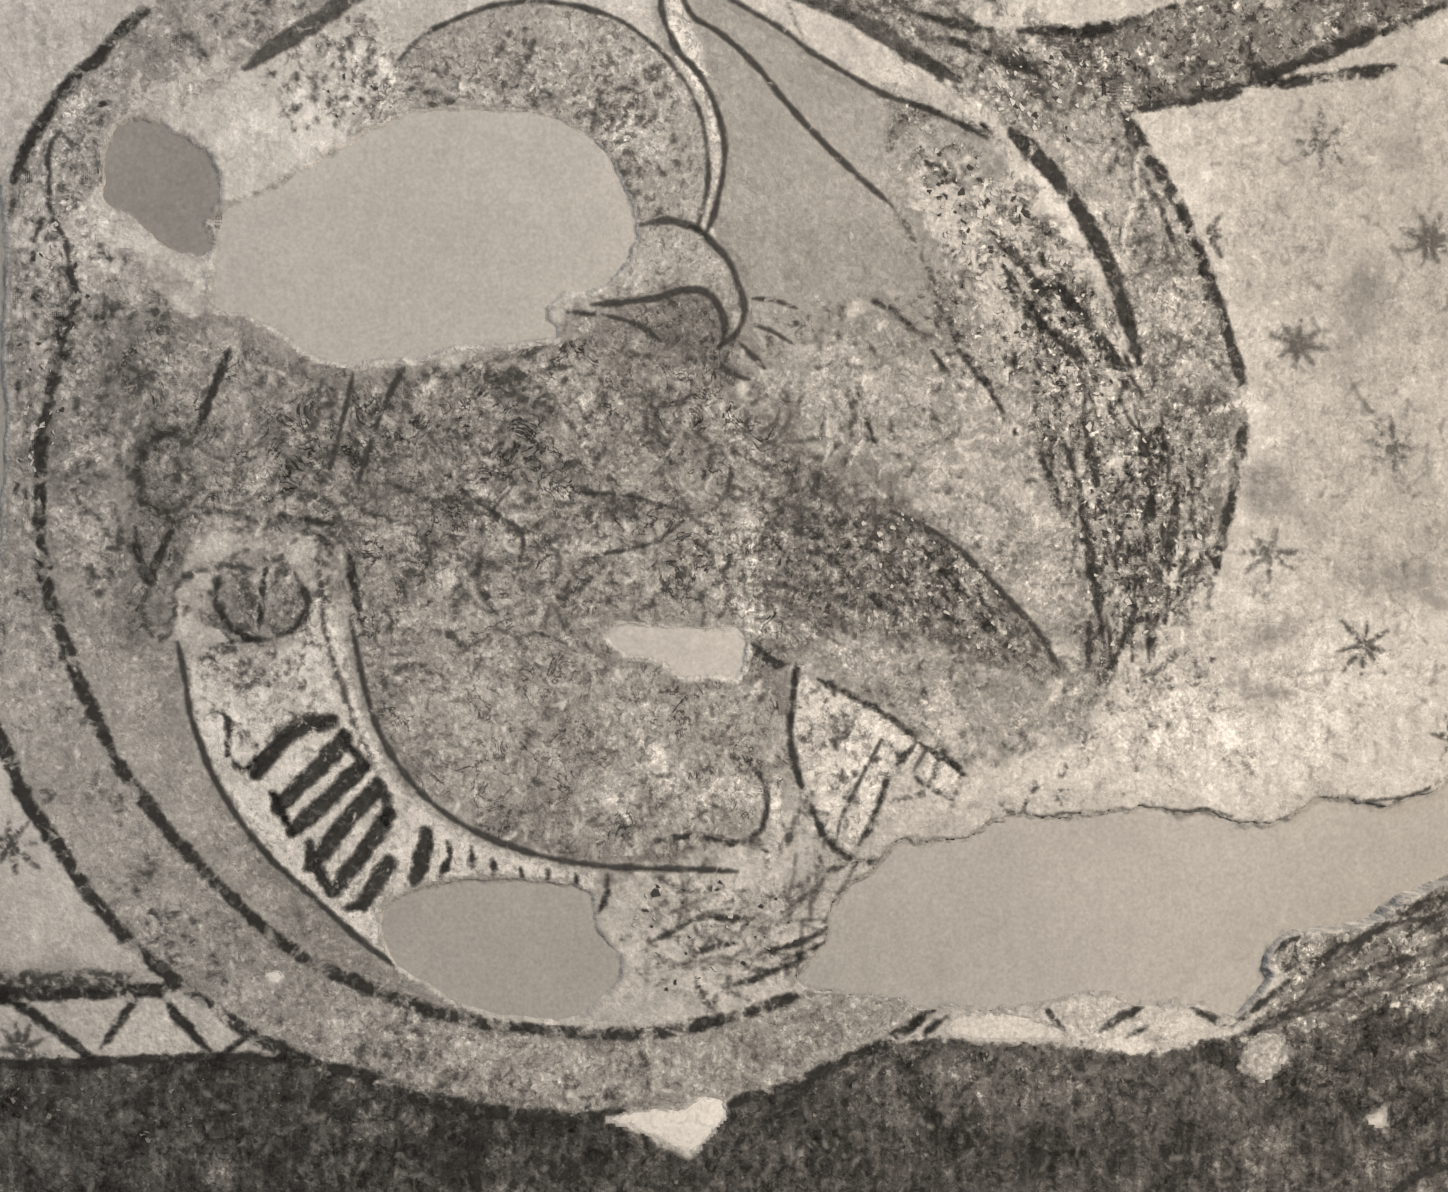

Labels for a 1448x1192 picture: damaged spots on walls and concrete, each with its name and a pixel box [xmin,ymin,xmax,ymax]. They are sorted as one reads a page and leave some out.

peeling [323,62,387,117]
flaking render [103,105,642,375]
flaking render [0,182,80,571]
flaking render [600,621,754,684]
flaking render [613,1097,727,1157]